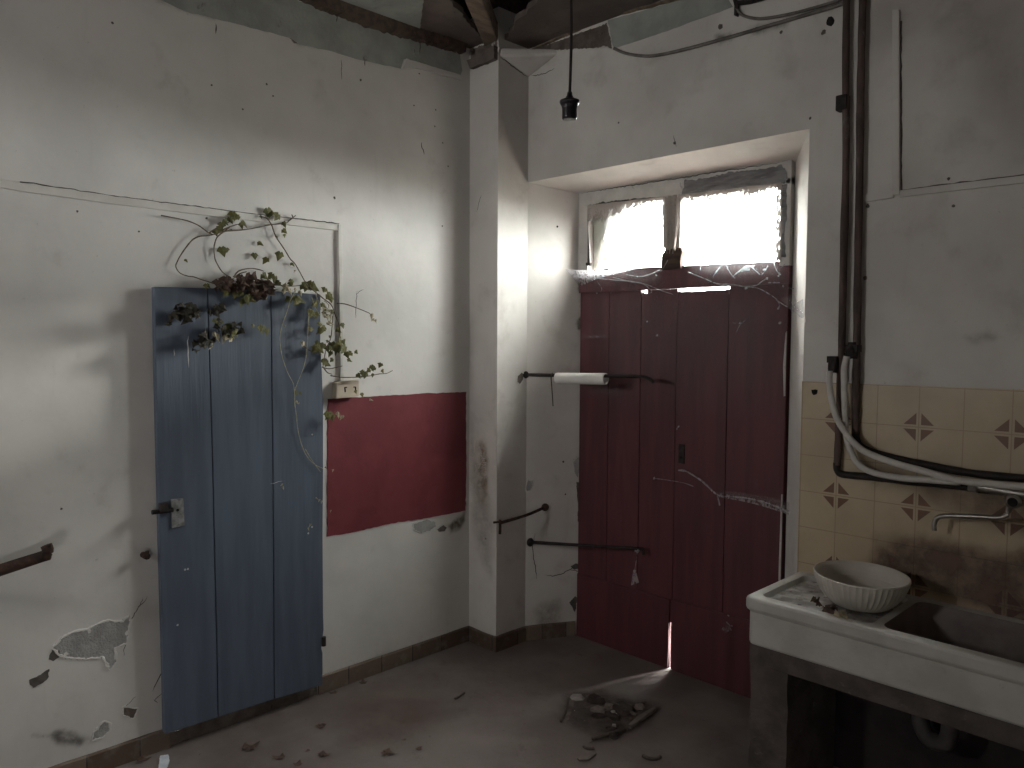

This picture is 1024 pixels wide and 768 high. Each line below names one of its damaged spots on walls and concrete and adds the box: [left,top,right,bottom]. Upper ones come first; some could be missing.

flaking render [539,22,613,52]
flaking render [29,614,132,688]